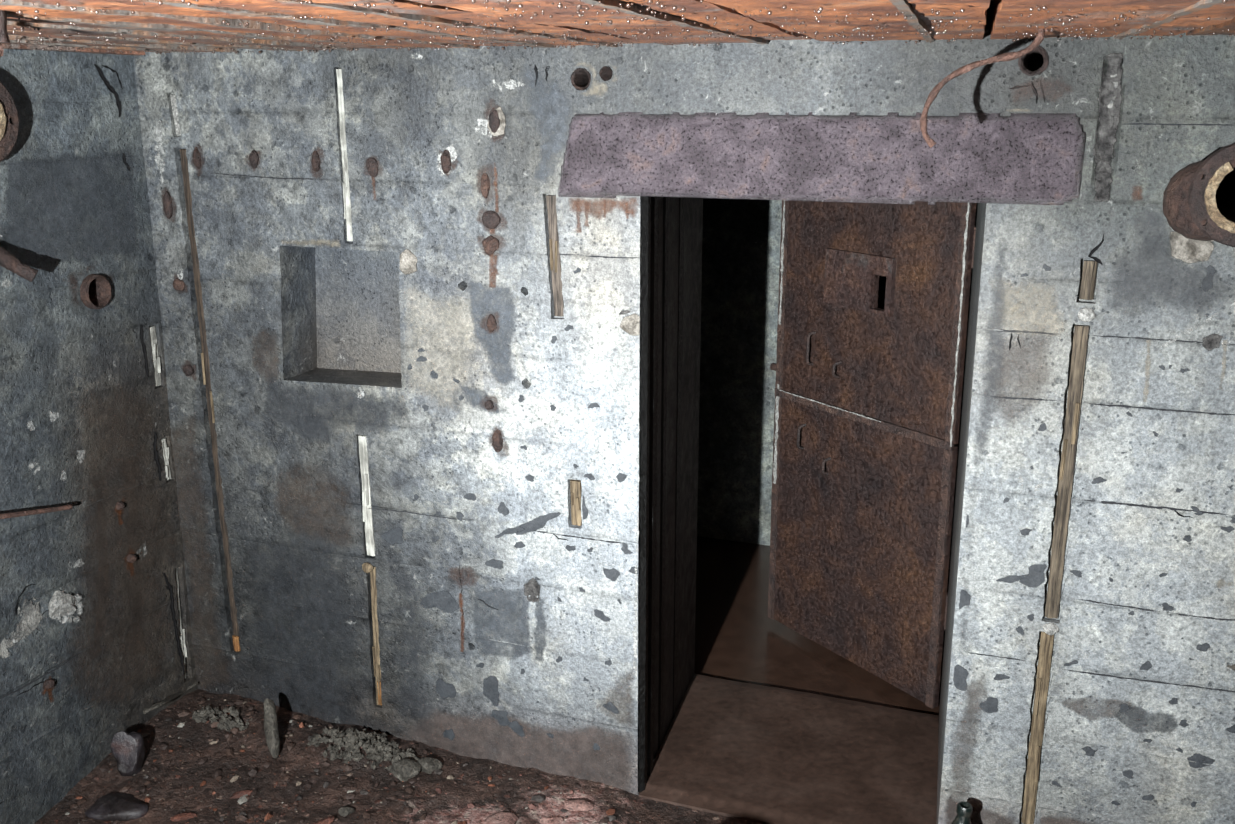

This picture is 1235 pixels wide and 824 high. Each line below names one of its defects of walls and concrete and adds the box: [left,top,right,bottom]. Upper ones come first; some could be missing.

corrosion [477,167,506,287]
corrosion [571,198,636,232]
damp [948,799,1012,824]